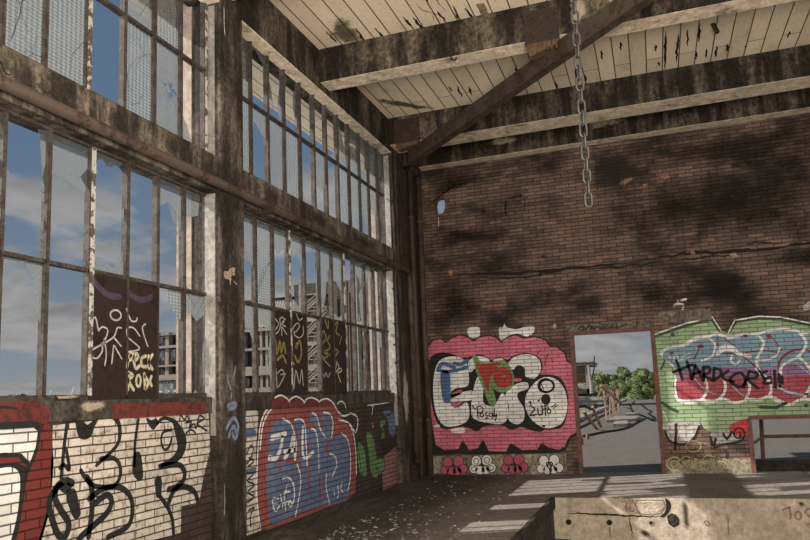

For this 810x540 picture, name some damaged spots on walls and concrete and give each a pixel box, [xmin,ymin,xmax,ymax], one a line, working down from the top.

crack [445,241,810,279]